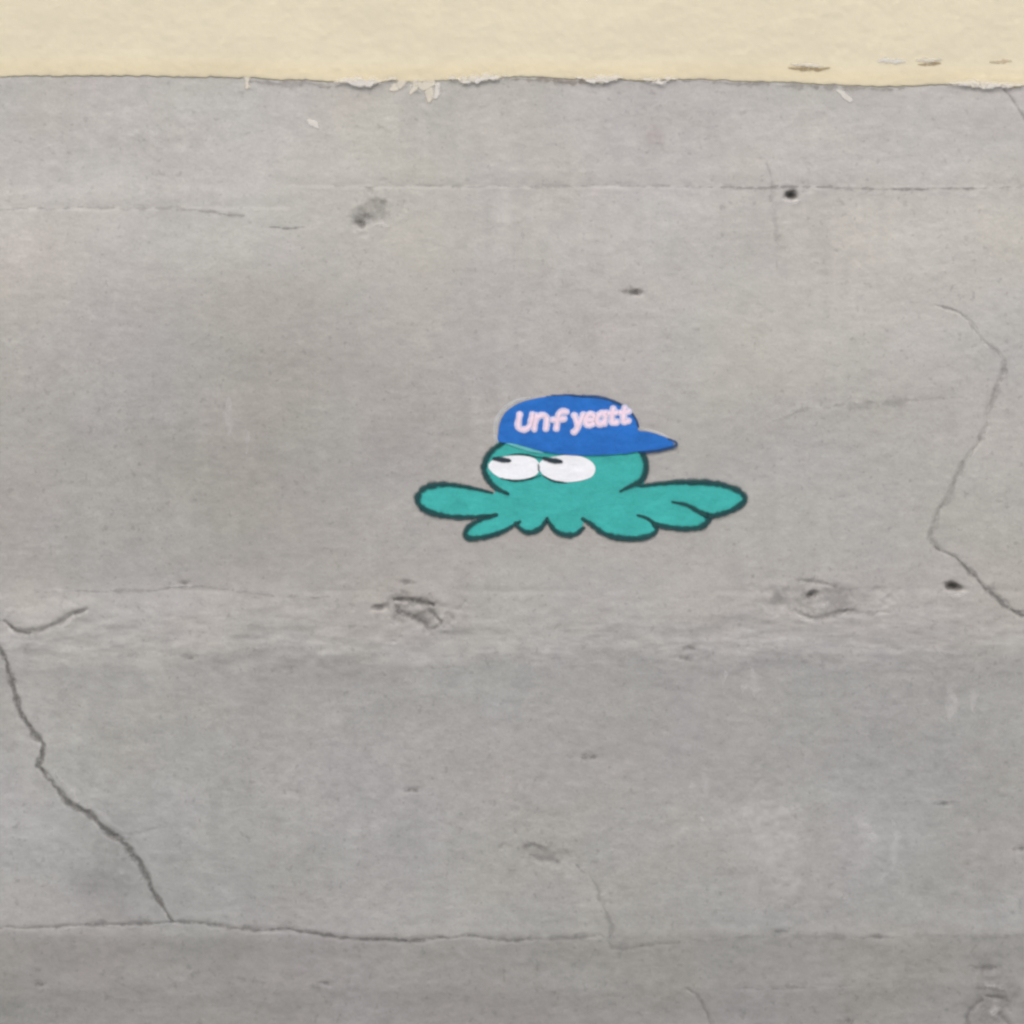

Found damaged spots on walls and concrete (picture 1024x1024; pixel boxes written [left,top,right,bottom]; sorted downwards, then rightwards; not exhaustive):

peeling [788,63,829,71]
peeling [335,76,396,87]
peeling [448,73,508,84]
peeling [576,74,676,84]
peeling [947,80,1023,89]
crack [1,653,173,921]